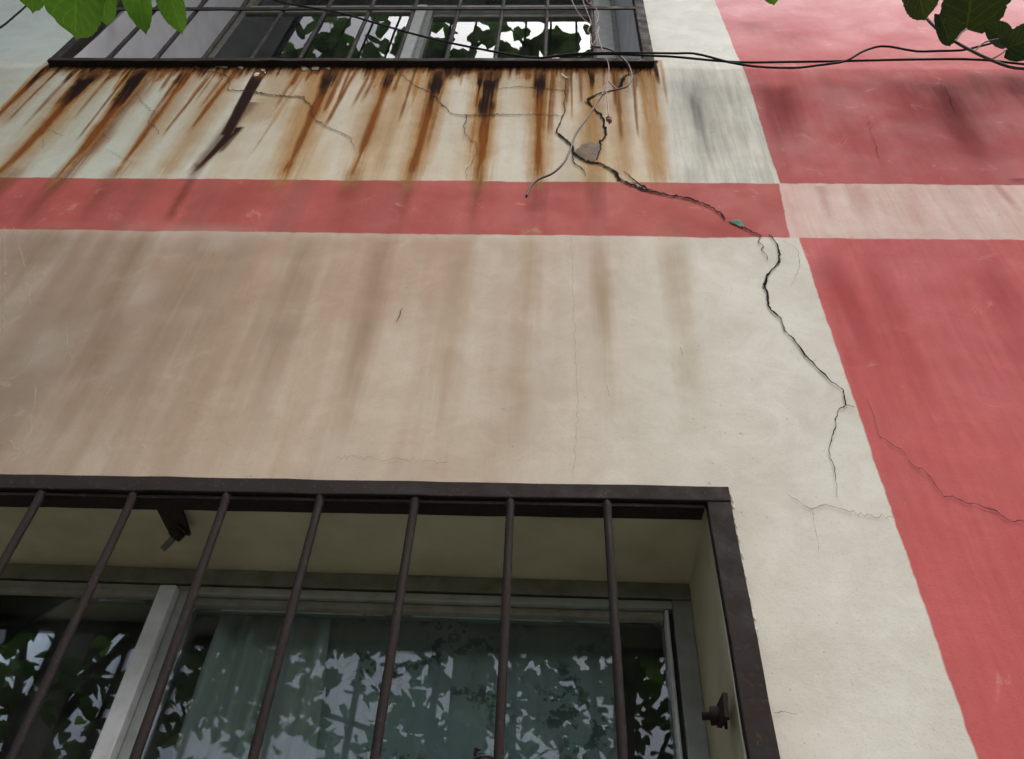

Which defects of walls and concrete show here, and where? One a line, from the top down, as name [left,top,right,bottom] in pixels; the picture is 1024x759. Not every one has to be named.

corrosion [0,60,663,185]
crack [400,67,1024,550]